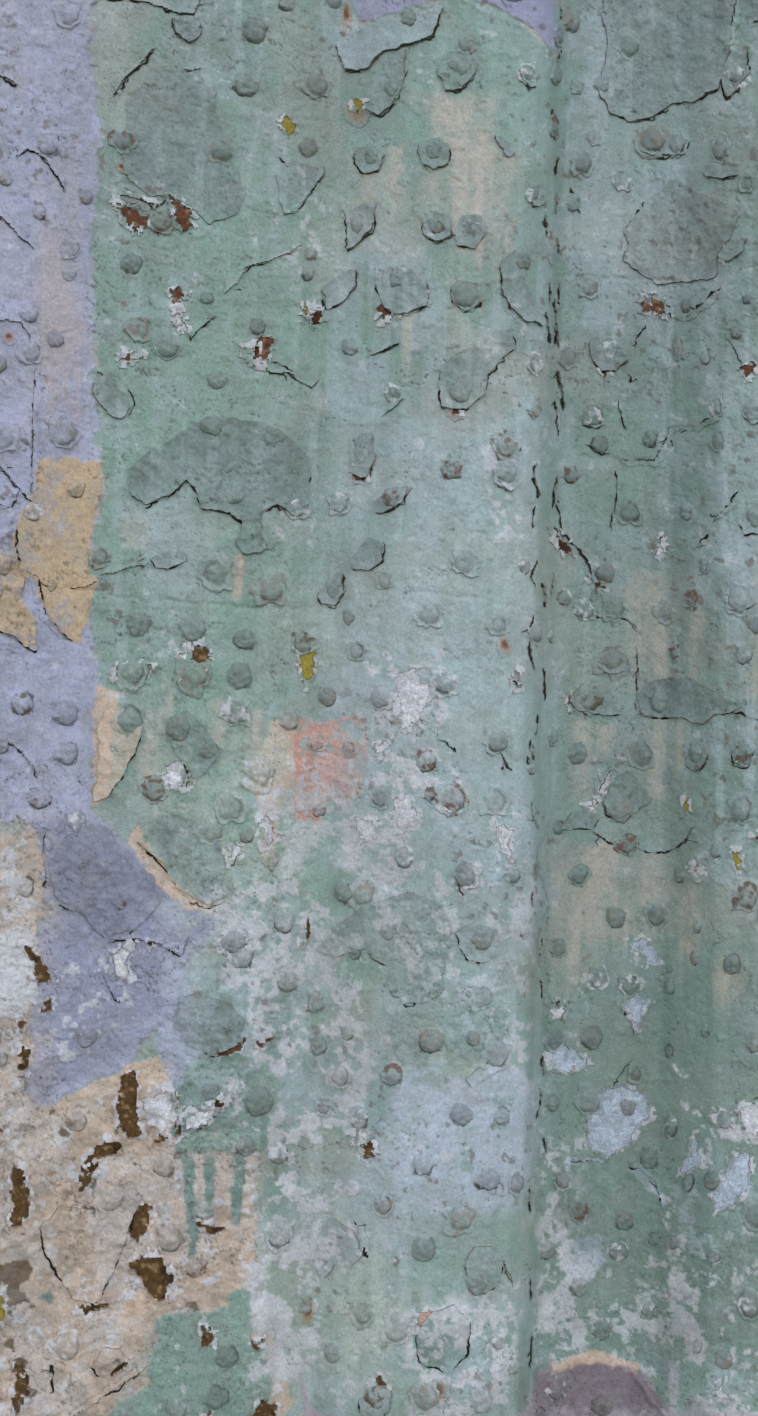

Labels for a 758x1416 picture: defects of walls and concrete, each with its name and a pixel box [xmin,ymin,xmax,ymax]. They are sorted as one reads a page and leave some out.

crack [113,47,156,98]
crack [109,0,203,15]
peeling [335,4,443,117]
peeling [109,64,246,237]
crack [189,157,325,341]
peeling [623,178,745,321]
crack [371,343,399,355]
crack [532,463,561,527]
peeling [93,658,158,801]
peeling [11,939,59,1079]
peeling [0,1065,233,1318]
crack [45,1365,148,1416]